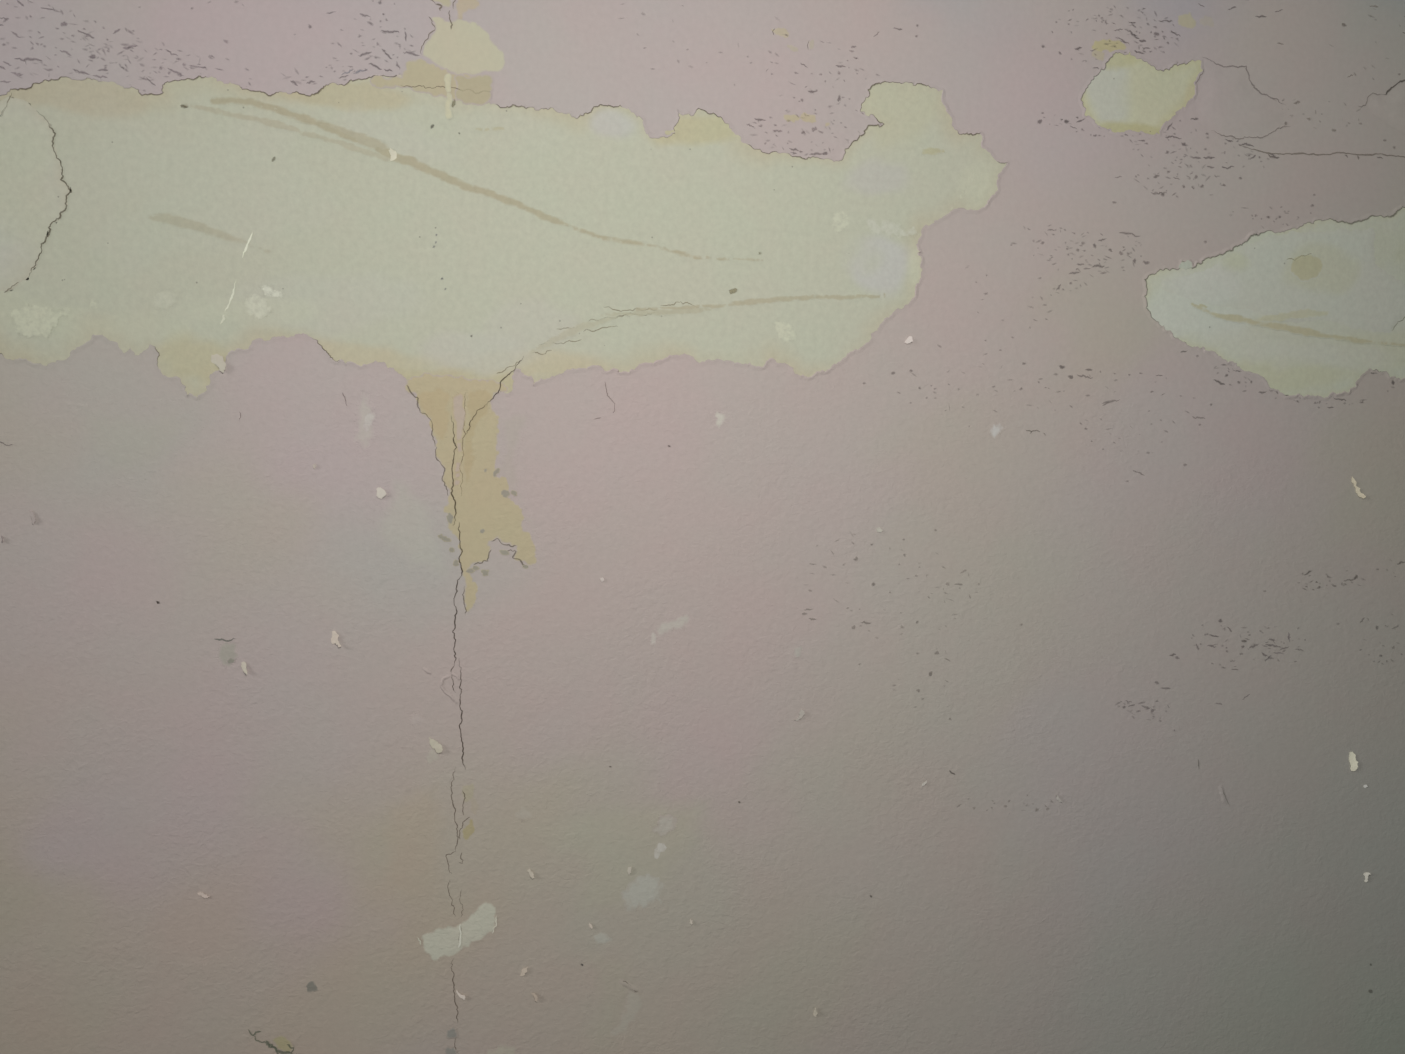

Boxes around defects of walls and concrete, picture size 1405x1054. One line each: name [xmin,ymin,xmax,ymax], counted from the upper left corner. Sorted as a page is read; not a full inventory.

peeling [0,2,1010,403]
peeling [1065,20,1233,195]
peeling [1074,203,1405,408]
crack [422,356,524,1054]